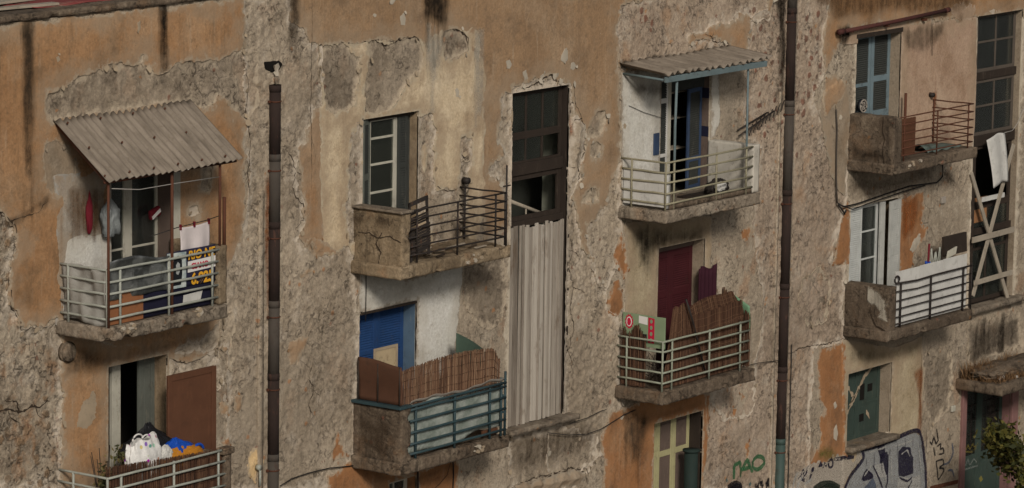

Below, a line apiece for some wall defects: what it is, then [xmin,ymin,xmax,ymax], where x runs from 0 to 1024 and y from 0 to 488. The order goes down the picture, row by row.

damp [23,21,33,130]
spalling [44,0,423,488]
crack [358,232,401,264]
spalling [488,48,630,488]
spalling [616,0,851,488]
peeling [867,288,887,322]
peeling [899,192,928,271]
crack [0,400,48,424]